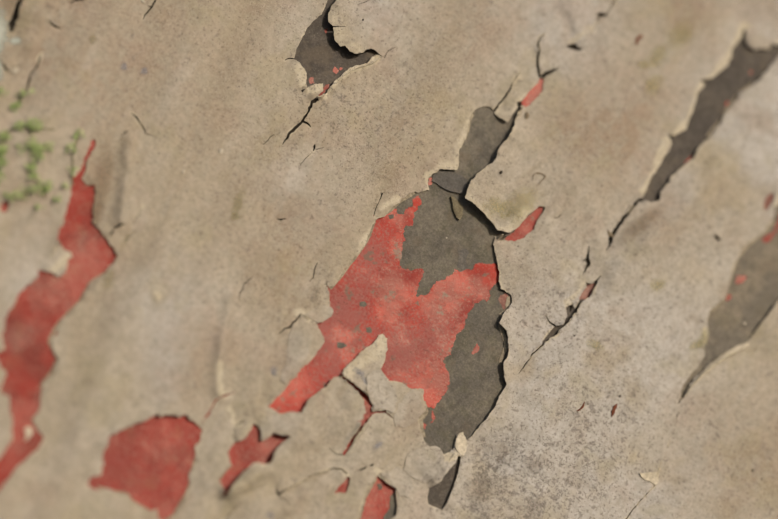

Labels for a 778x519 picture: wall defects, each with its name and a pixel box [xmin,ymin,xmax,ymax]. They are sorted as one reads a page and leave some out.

crack [8,0,23,32]
peeling [291,0,383,101]
crack [596,2,613,21]
crack [264,98,324,164]
peeling [619,23,778,231]
peeling [0,138,129,490]
peeling [218,74,599,519]
peeling [679,192,778,401]
peeling [87,401,202,519]